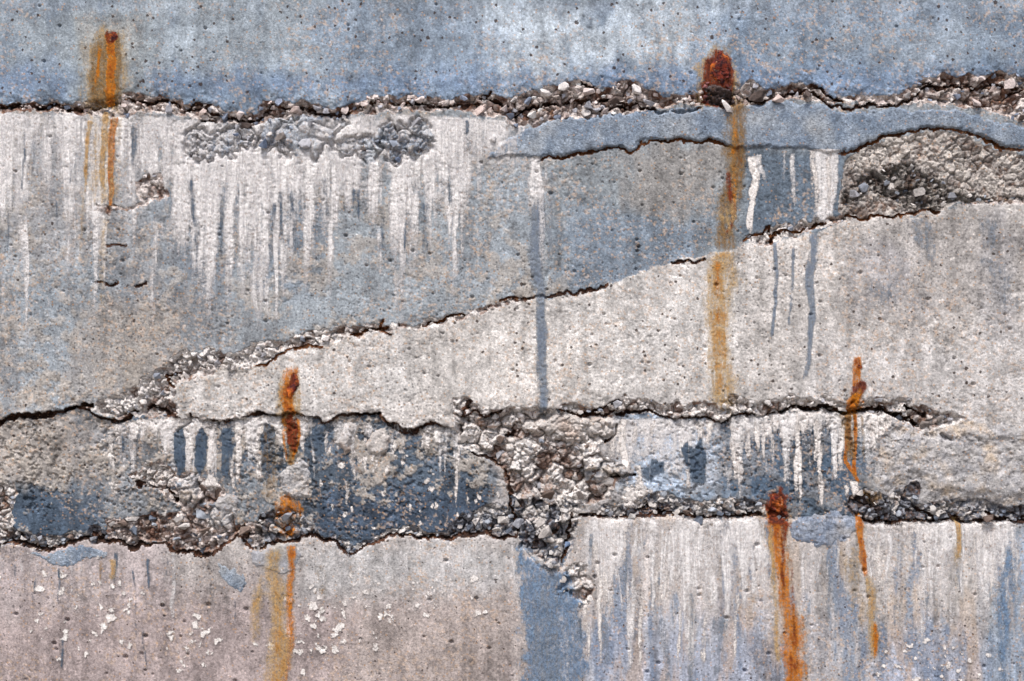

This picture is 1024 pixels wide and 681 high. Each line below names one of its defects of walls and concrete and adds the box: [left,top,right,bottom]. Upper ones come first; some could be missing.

damp [0,113,555,419]
crack [0,81,666,158]
peeling [0,70,1024,246]
rust [694,46,746,409]
damp [770,149,840,379]
crack [742,82,1024,156]
spalling [0,394,1024,610]
damp [511,411,892,681]
crack [559,399,927,443]
rust [762,487,808,681]
rust [840,357,882,503]
damp [867,520,1020,681]